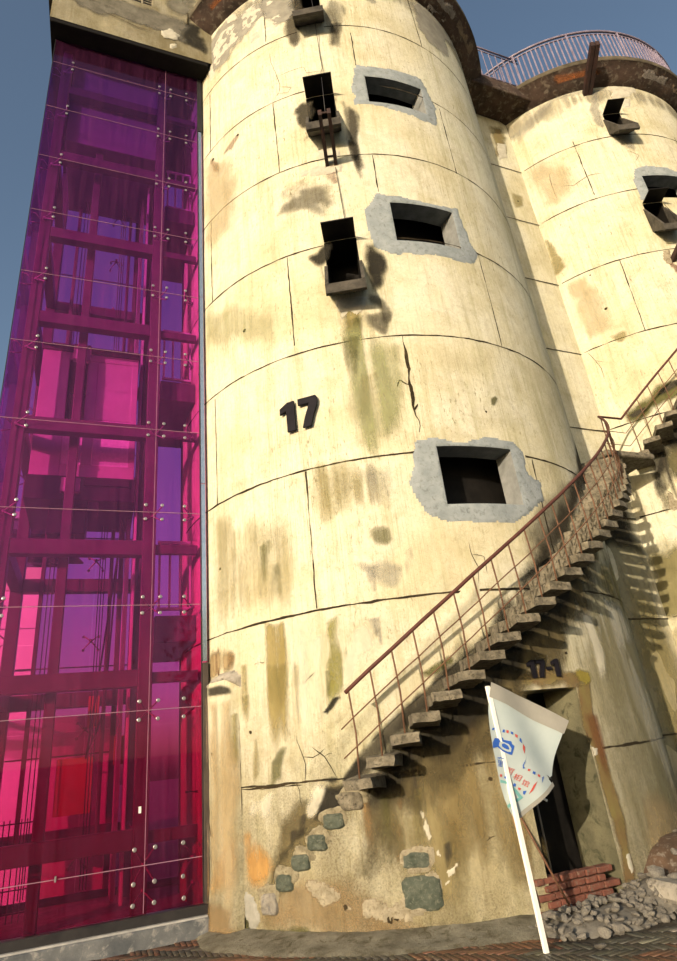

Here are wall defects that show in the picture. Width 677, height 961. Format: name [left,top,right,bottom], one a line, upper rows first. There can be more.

water stain [75,0,207,53]
peeling [208,0,294,82]
water stain [309,244,332,265]
water stain [345,245,398,449]
crack [397,336,421,432]
water stain [626,380,677,421]
water stain [653,428,677,506]
water stain [259,623,298,733]
water stain [269,510,677,899]
crack [240,739,337,805]
rust [248,847,269,883]